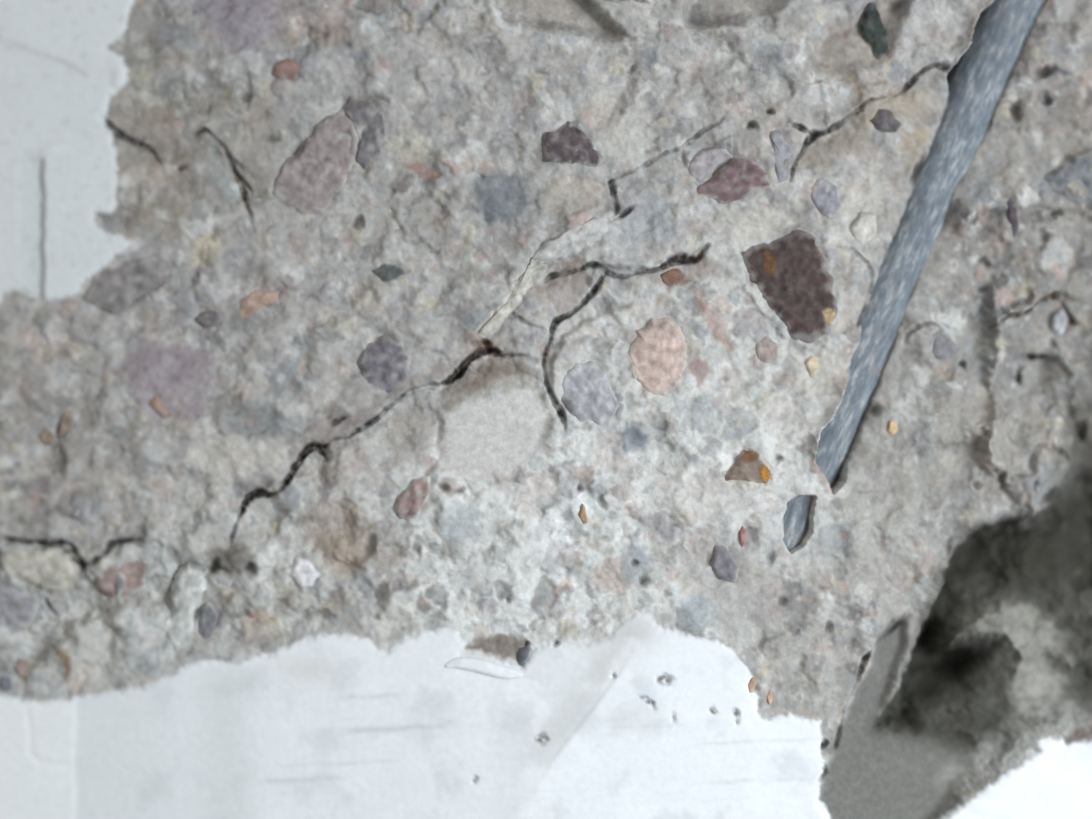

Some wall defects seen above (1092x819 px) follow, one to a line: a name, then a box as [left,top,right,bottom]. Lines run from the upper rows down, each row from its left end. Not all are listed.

spalling [273,109,367,216]
crack [791,123,839,171]
crack [658,255,700,270]
crack [241,408,386,509]
crack [442,340,500,385]
spalling [436,381,555,484]
crack [542,262,608,421]
spalling [561,361,619,426]
spalling [628,317,687,396]
spalling [0,545,80,591]
crack [8,537,135,569]
spalling [872,429,1092,804]